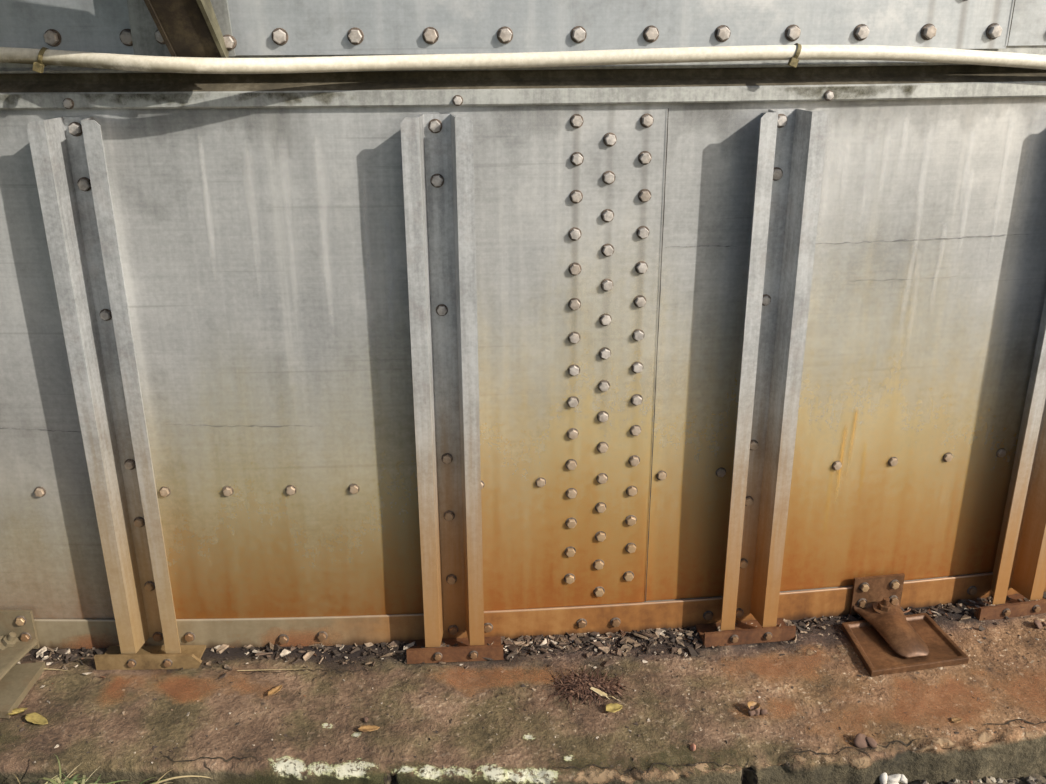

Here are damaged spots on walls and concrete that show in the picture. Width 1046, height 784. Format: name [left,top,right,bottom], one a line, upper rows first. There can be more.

rust [166,474,424,619]
rust [481,396,734,611]
rust [780,402,1015,591]
crack [984,718,1046,726]